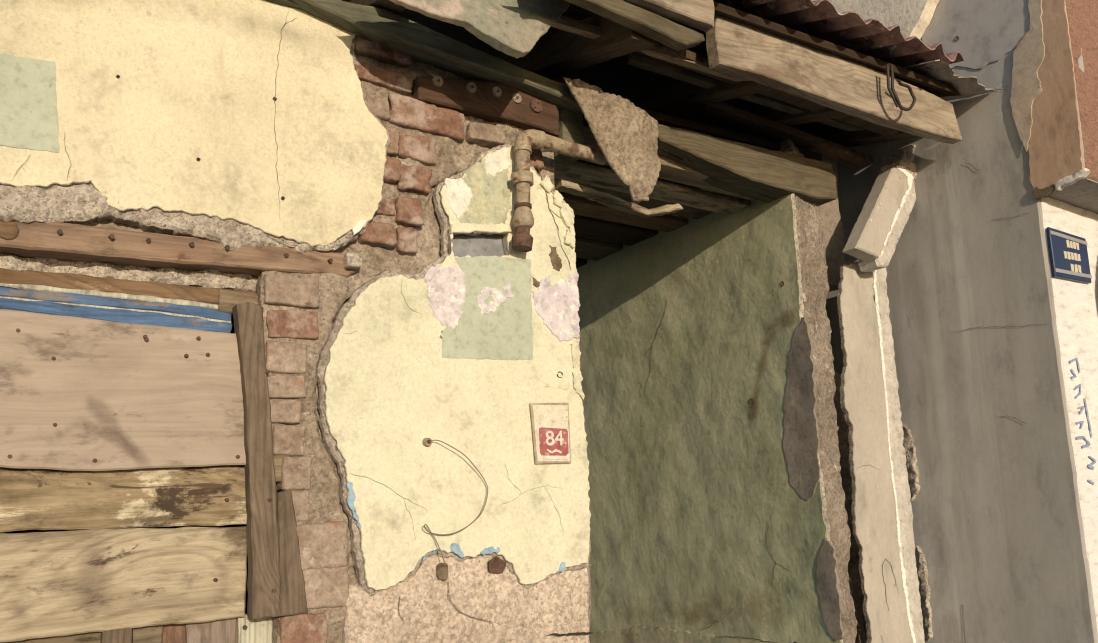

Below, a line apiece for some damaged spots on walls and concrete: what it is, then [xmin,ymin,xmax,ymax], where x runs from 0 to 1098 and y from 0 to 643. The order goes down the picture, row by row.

crack [274,8,294,218]
peeling [921,0,1092,199]
flaking render [0,37,592,643]
crack [701,606,777,643]
peeling [783,316,820,501]
peeling [816,538,843,642]
crack [832,349,898,643]